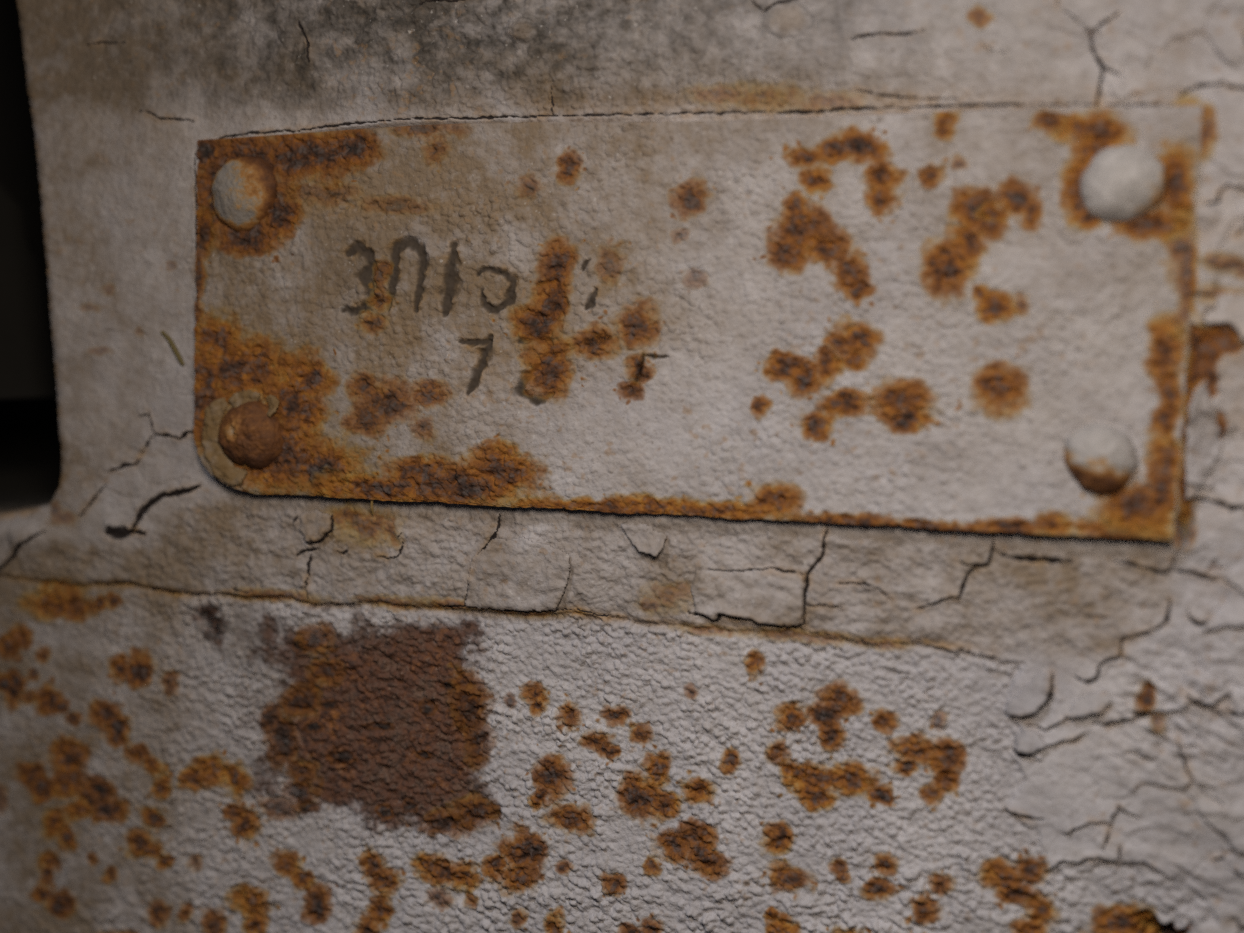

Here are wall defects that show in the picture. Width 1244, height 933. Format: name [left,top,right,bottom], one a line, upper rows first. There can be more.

crack [139,0,1244,293]
rust [193,98,1244,545]
crack [293,514,469,607]
crack [687,524,1073,658]
peeling [1006,672,1052,755]
peeling [1070,690,1112,718]
crack [1009,551,1244,761]
spalling [1139,682,1155,710]
rust [760,821,817,933]
rust [862,852,951,933]
rust [980,848,1058,933]
rust [1092,900,1160,933]